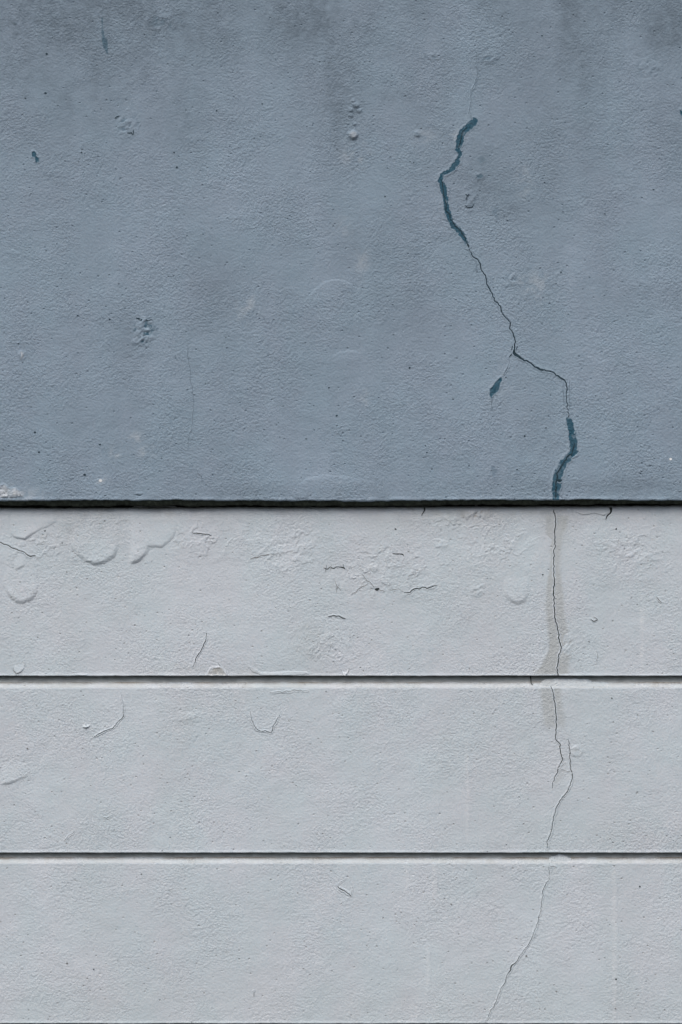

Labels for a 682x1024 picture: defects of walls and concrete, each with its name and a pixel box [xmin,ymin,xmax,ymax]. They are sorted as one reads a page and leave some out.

peeling [0,481,682,612]
crack [435,45,580,1023]